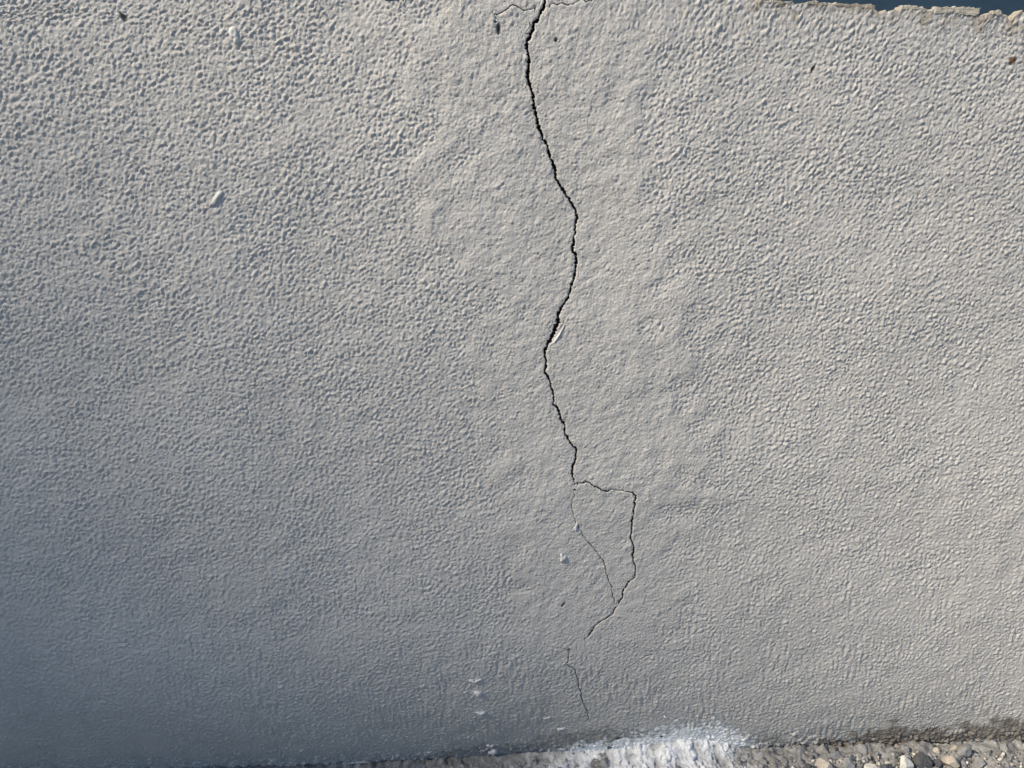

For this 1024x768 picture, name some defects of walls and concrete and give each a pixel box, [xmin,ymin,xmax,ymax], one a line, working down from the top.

crack [490,0,640,722]